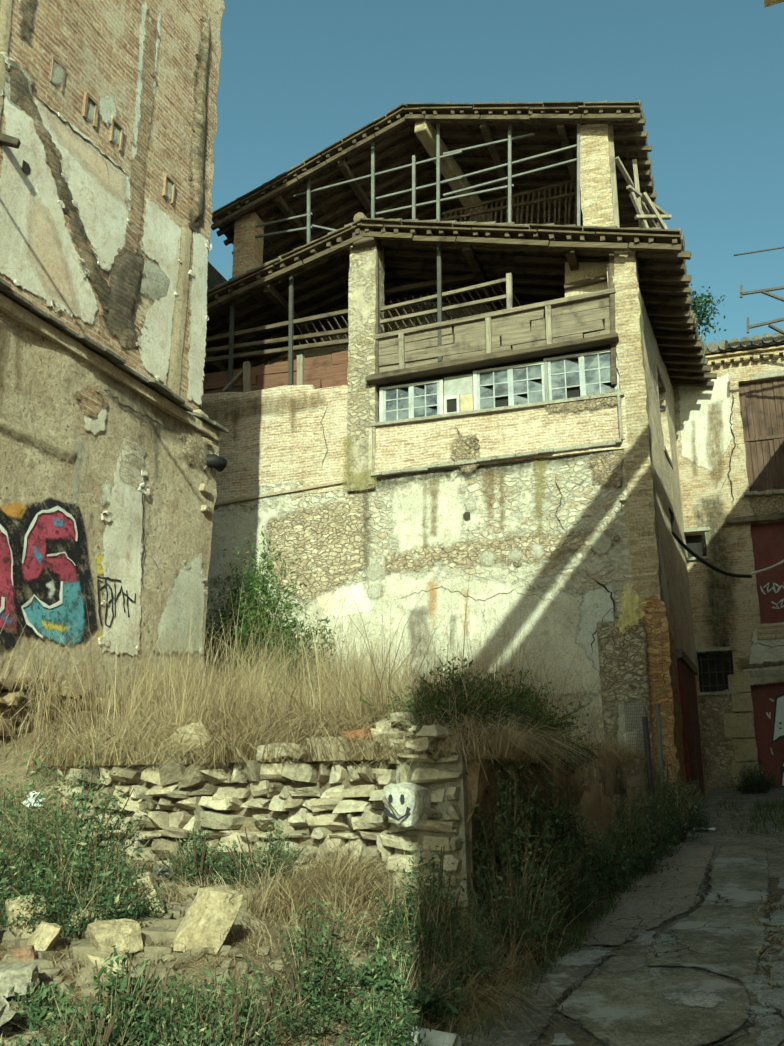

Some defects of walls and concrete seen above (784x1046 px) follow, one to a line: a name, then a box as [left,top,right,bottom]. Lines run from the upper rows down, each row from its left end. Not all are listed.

flaking render [0,0,213,406]
flaking render [75,385,108,435]
spalling [178,432,210,474]
spalling [589,450,624,489]
flaking render [677,374,734,472]
crack [721,392,743,506]
flaking render [98,439,150,656]
flaking render [155,499,283,655]
flaking render [270,434,615,700]
crack [584,564,619,658]
leakage [698,499,733,660]